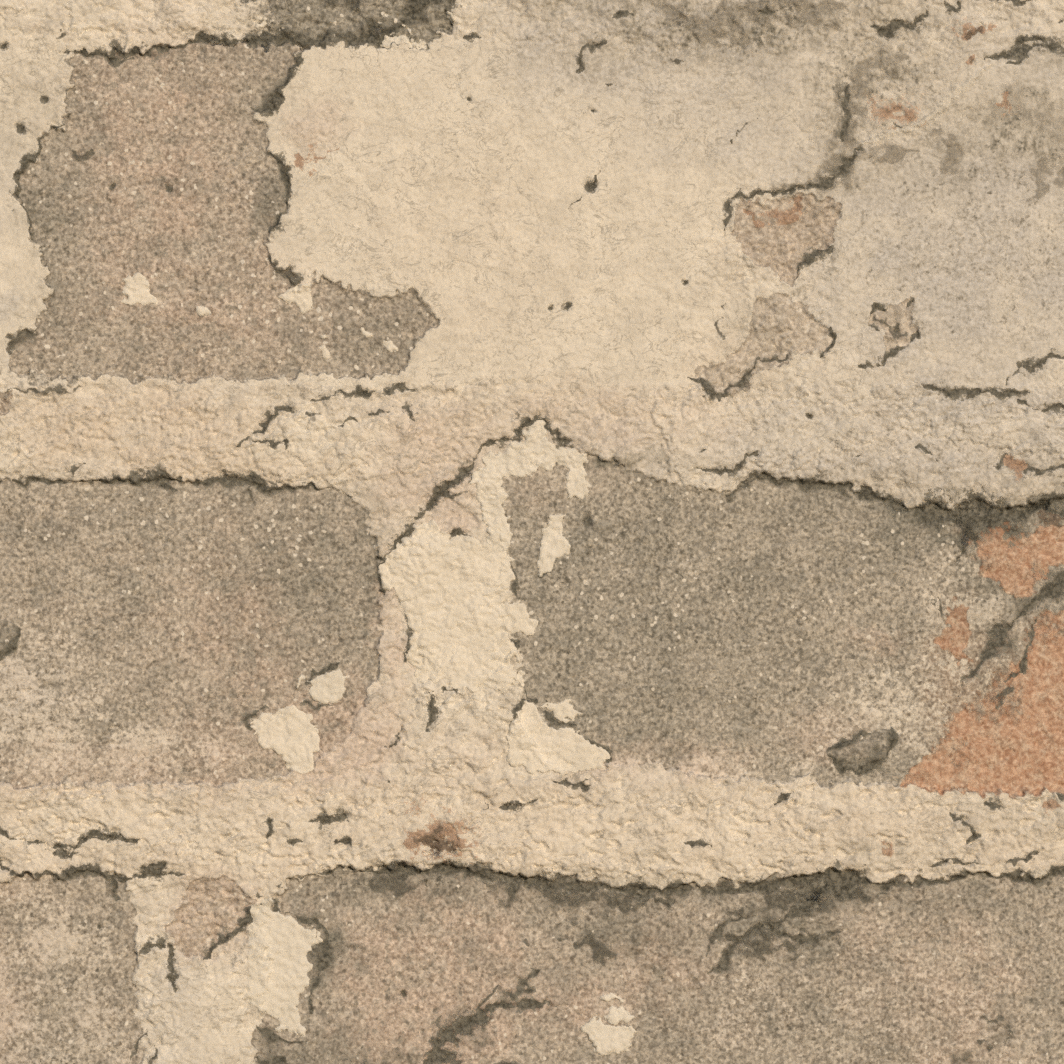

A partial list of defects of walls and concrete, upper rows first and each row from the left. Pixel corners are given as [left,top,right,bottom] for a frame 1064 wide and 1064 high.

peeling [0,0,462,416]
spalling [687,192,842,402]
spalling [868,298,919,355]
peeling [240,662,347,774]
crack [374,412,574,595]
crack [696,443,1064,564]
crack [931,596,944,617]
spalling [900,610,1064,798]
crack [943,567,1064,704]
spalling [968,509,1064,599]
peeling [165,875,348,1064]
peeling [581,992,637,1056]